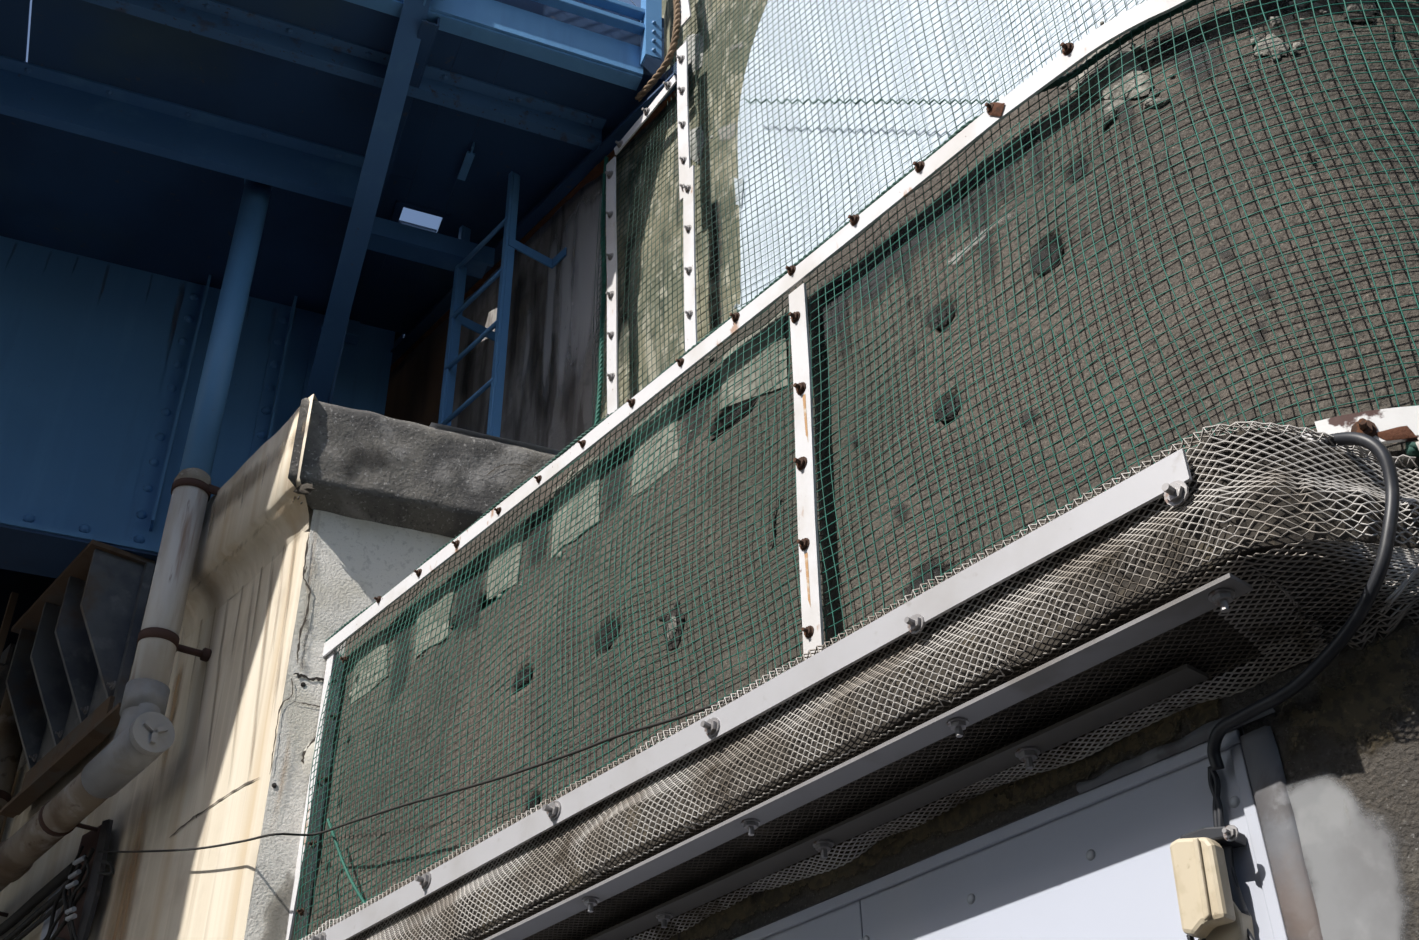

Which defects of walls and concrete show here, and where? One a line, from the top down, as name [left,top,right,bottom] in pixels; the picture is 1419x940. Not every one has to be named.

spalling [1249,0,1379,61]
spalling [1059,36,1174,129]
damp [708,203,721,280]
damp [510,195,602,414]
corrosion [1376,426,1417,441]
crack [169,535,337,838]